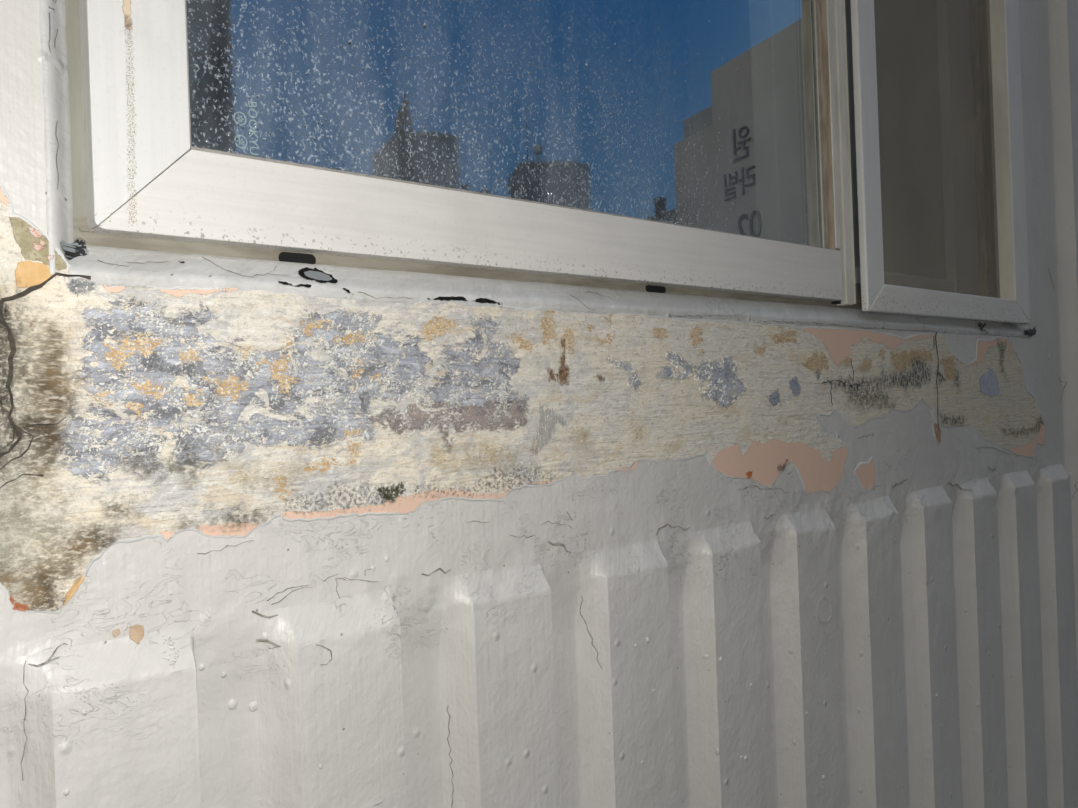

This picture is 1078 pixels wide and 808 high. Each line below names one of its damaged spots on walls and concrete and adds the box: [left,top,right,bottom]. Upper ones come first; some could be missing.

crack [203,257,281,277]
leakage [0,309,71,490]
crack [0,260,170,488]
peeling [0,180,1045,614]
crack [673,312,946,430]
leakage [828,357,943,406]
leakage [0,511,70,610]
leakage [69,529,115,557]
crack [21,643,68,780]